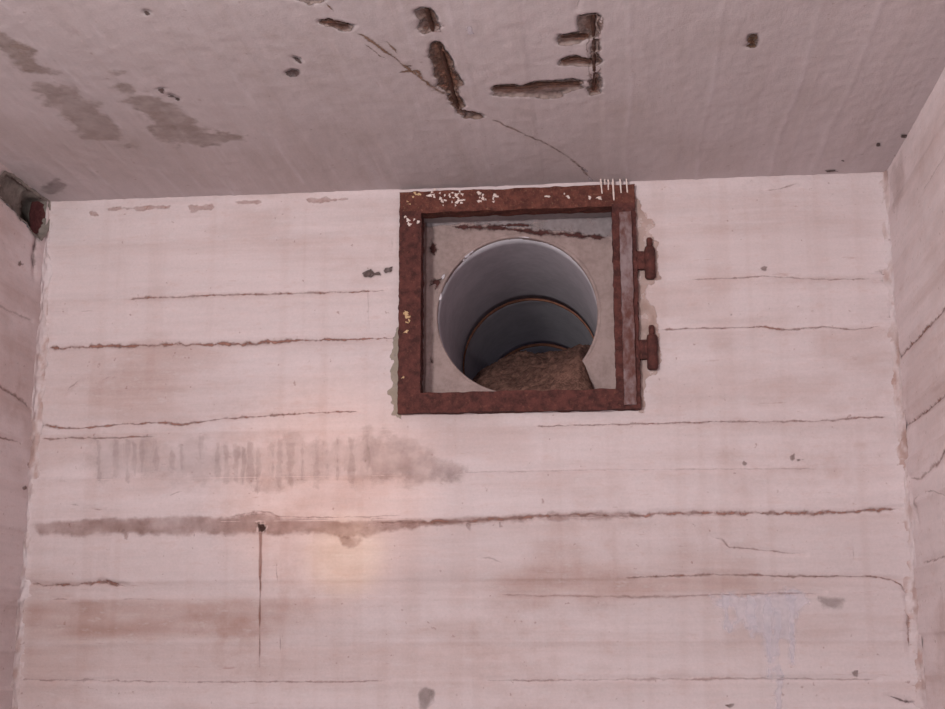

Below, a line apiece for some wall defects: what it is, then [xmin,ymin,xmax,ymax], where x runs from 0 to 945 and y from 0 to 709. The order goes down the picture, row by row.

spalling [319,18,354,32]
crack [359,34,445,94]
spalling [415,7,483,119]
spalling [491,13,603,99]